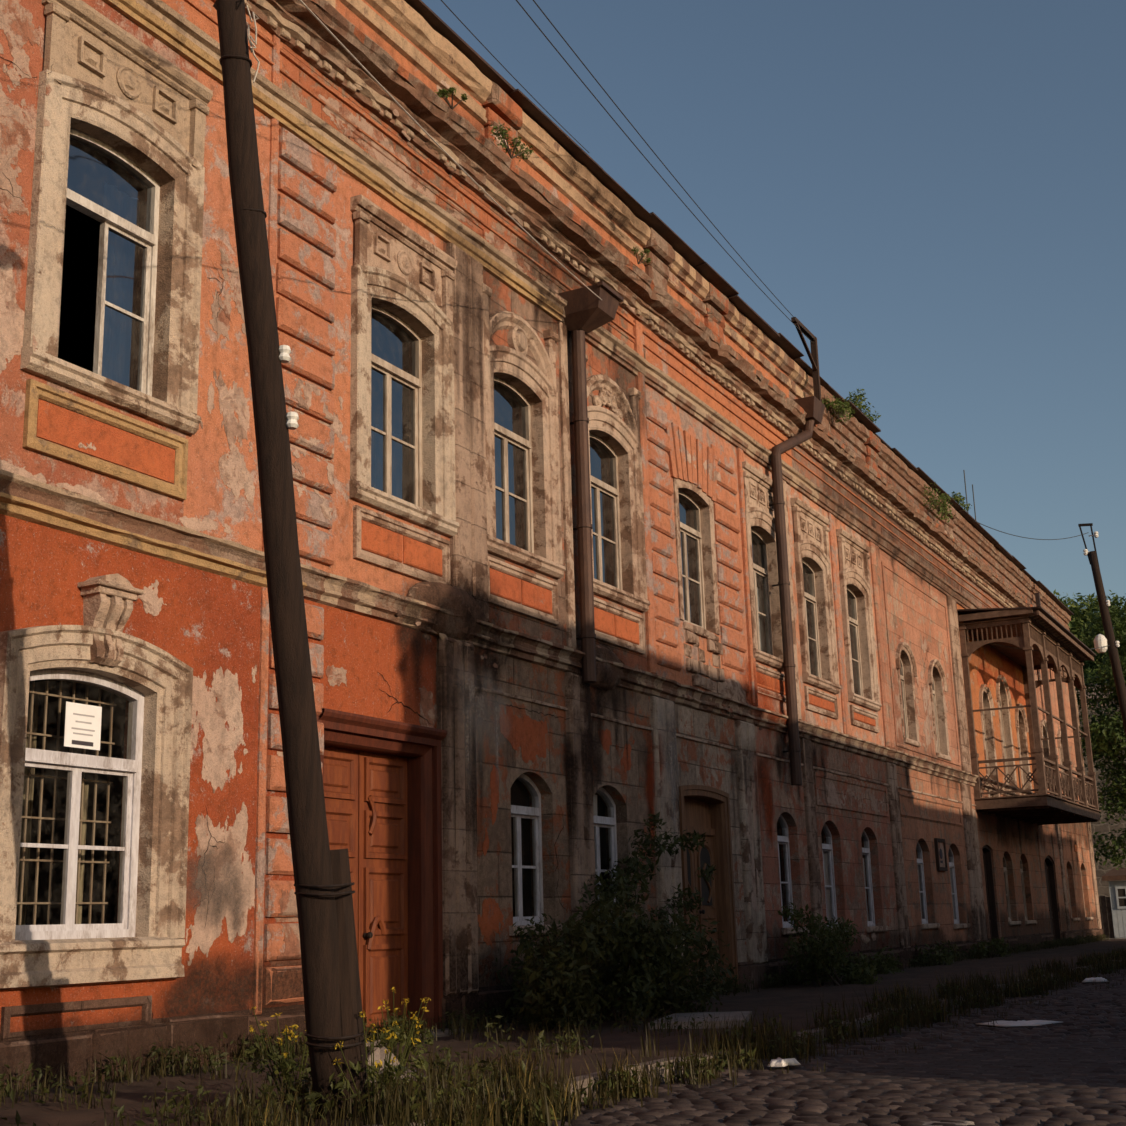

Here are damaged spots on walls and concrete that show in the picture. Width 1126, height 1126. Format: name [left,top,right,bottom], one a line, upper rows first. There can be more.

peeling [0,0,52,222]
peeling [0,263,38,374]
peeling [209,249,246,341]
leakage [456,271,500,403]
peeling [0,460,105,501]
peeling [179,516,232,534]
peeling [200,371,255,506]
peeling [188,665,257,793]
peeling [499,704,548,763]
peeling [186,802,302,974]